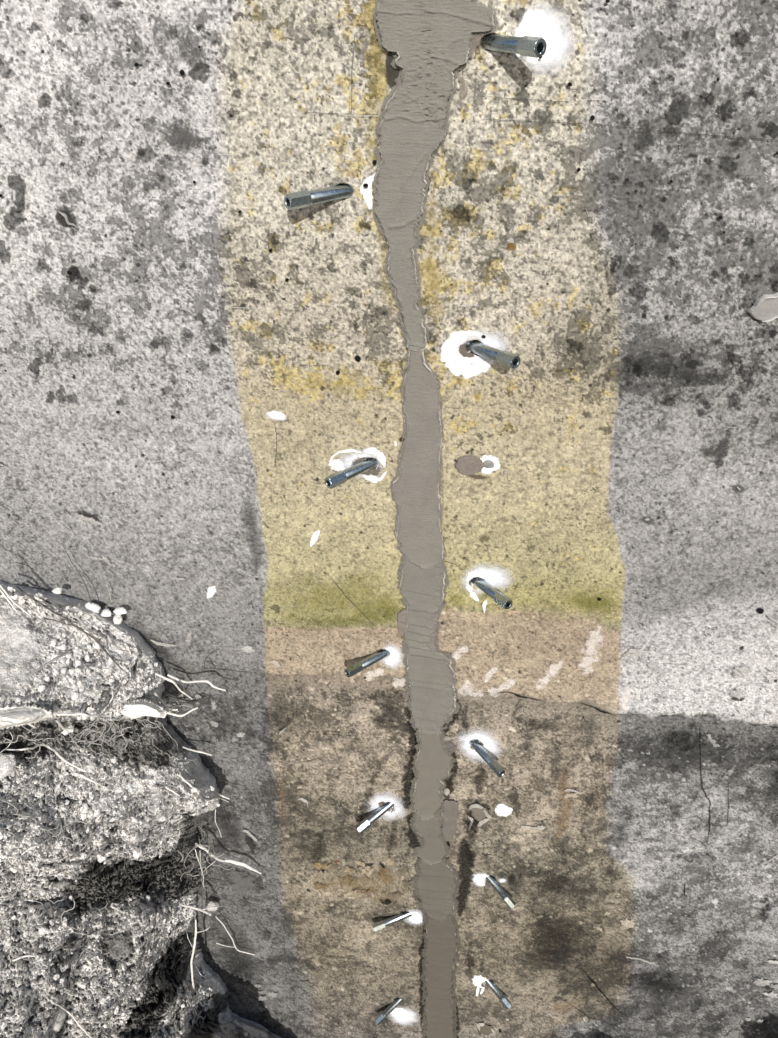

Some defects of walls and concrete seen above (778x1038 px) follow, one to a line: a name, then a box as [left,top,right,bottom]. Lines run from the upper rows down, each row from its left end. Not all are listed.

crack [481,96,778,141]
crack [306,0,498,1038]
crack [700,715,729,841]
crack [563,967,632,1033]